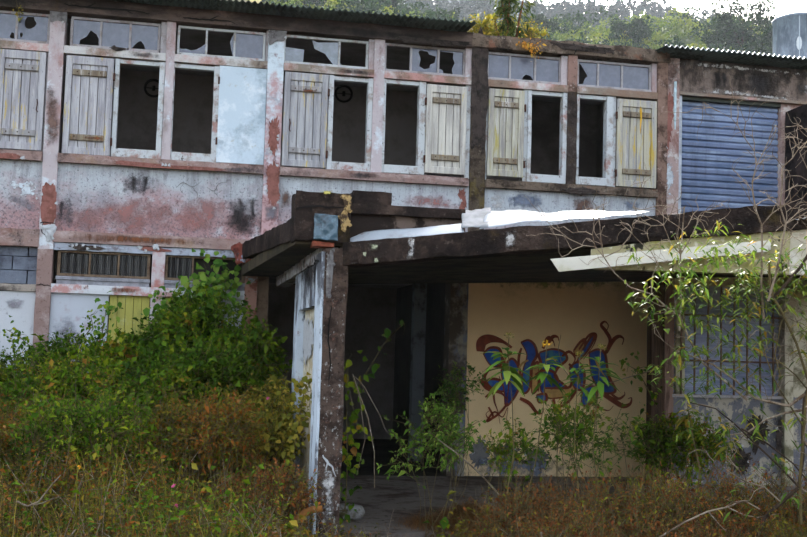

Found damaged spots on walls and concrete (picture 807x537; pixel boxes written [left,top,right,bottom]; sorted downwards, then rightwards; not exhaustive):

leakage [698,63,807,100]
peeling [265,115,280,209]
peeling [9,181,58,242]
leakage [59,175,222,233]
leakage [228,200,255,233]